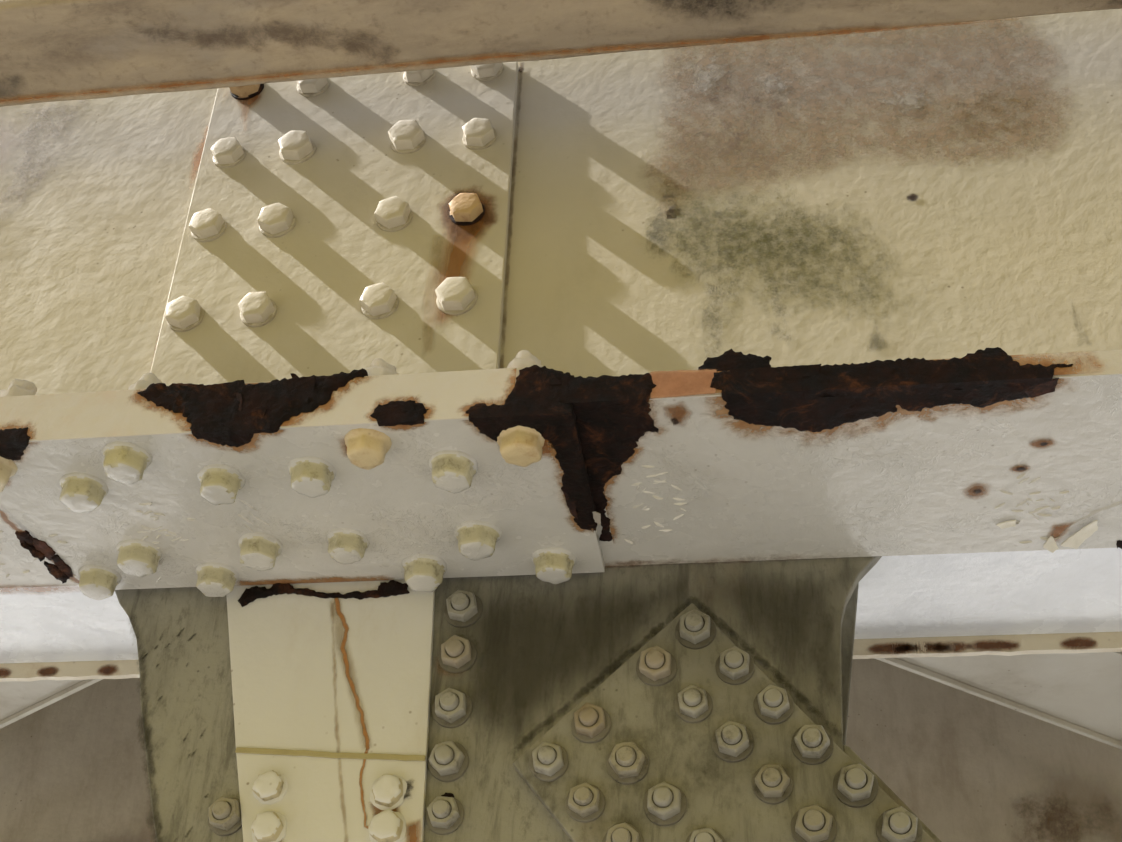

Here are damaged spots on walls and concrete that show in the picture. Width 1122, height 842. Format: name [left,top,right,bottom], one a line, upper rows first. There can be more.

corrosion [439,191,494,285]
leakage [650,201,881,304]
corrosion [0,425,34,461]
corrosion [133,368,371,452]
corrosion [461,358,661,542]
corrosion [698,347,1100,440]
corrosion [237,577,410,616]
corrosion [38,667,57,676]
corrosion [98,665,116,675]
crack [334,598,369,829]
corrosion [869,641,1018,654]
corrosion [1061,638,1096,649]